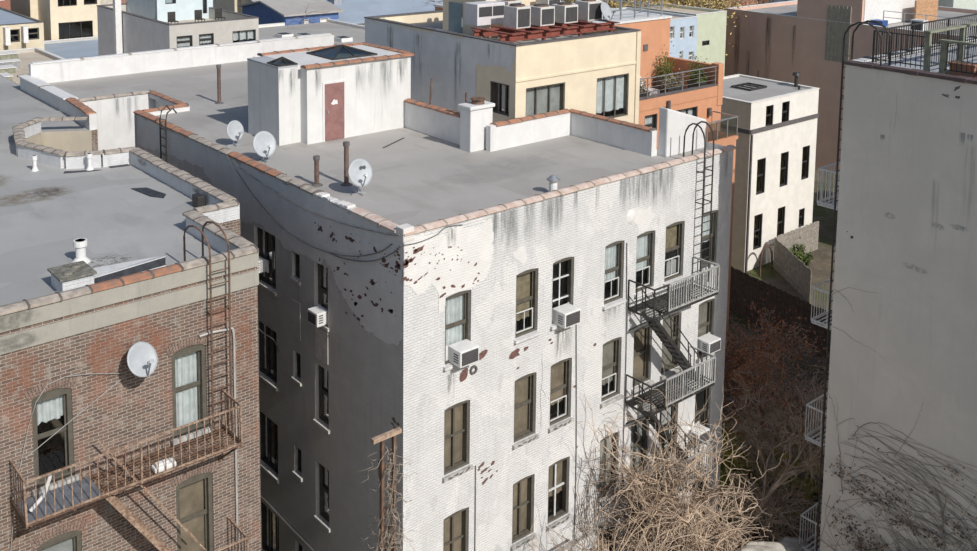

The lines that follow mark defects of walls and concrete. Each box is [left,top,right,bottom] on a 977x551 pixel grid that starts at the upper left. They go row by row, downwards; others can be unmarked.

peeling [137,115,494,346]
peeling [448,461,498,485]